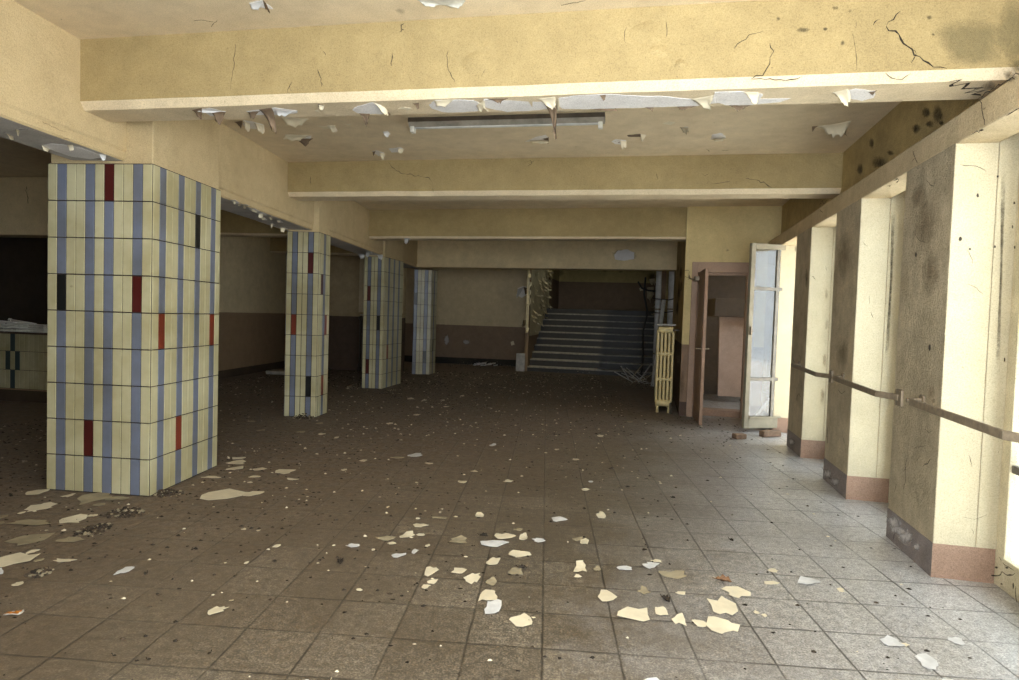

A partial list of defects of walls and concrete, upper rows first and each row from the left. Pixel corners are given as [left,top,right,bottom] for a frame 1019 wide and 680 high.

peeling [418,0,465,9]
crack [734,32,800,81]
crack [853,11,1019,135]
peeling [833,89,877,107]
peeling [192,108,226,125]
peeling [235,104,324,146]
peeling [352,91,791,144]
peeling [611,134,646,149]
peeling [812,121,851,138]
peeling [231,200,287,232]